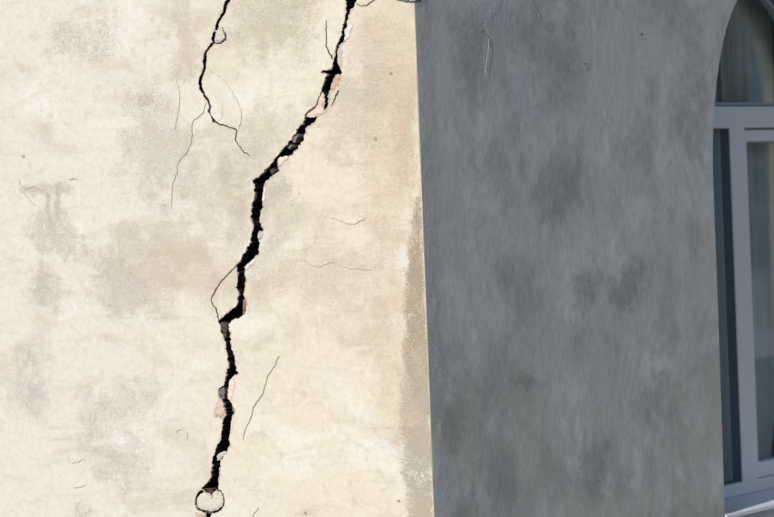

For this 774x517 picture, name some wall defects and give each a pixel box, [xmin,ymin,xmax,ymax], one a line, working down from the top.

crack [171,0,249,206]
crack [196,0,374,517]